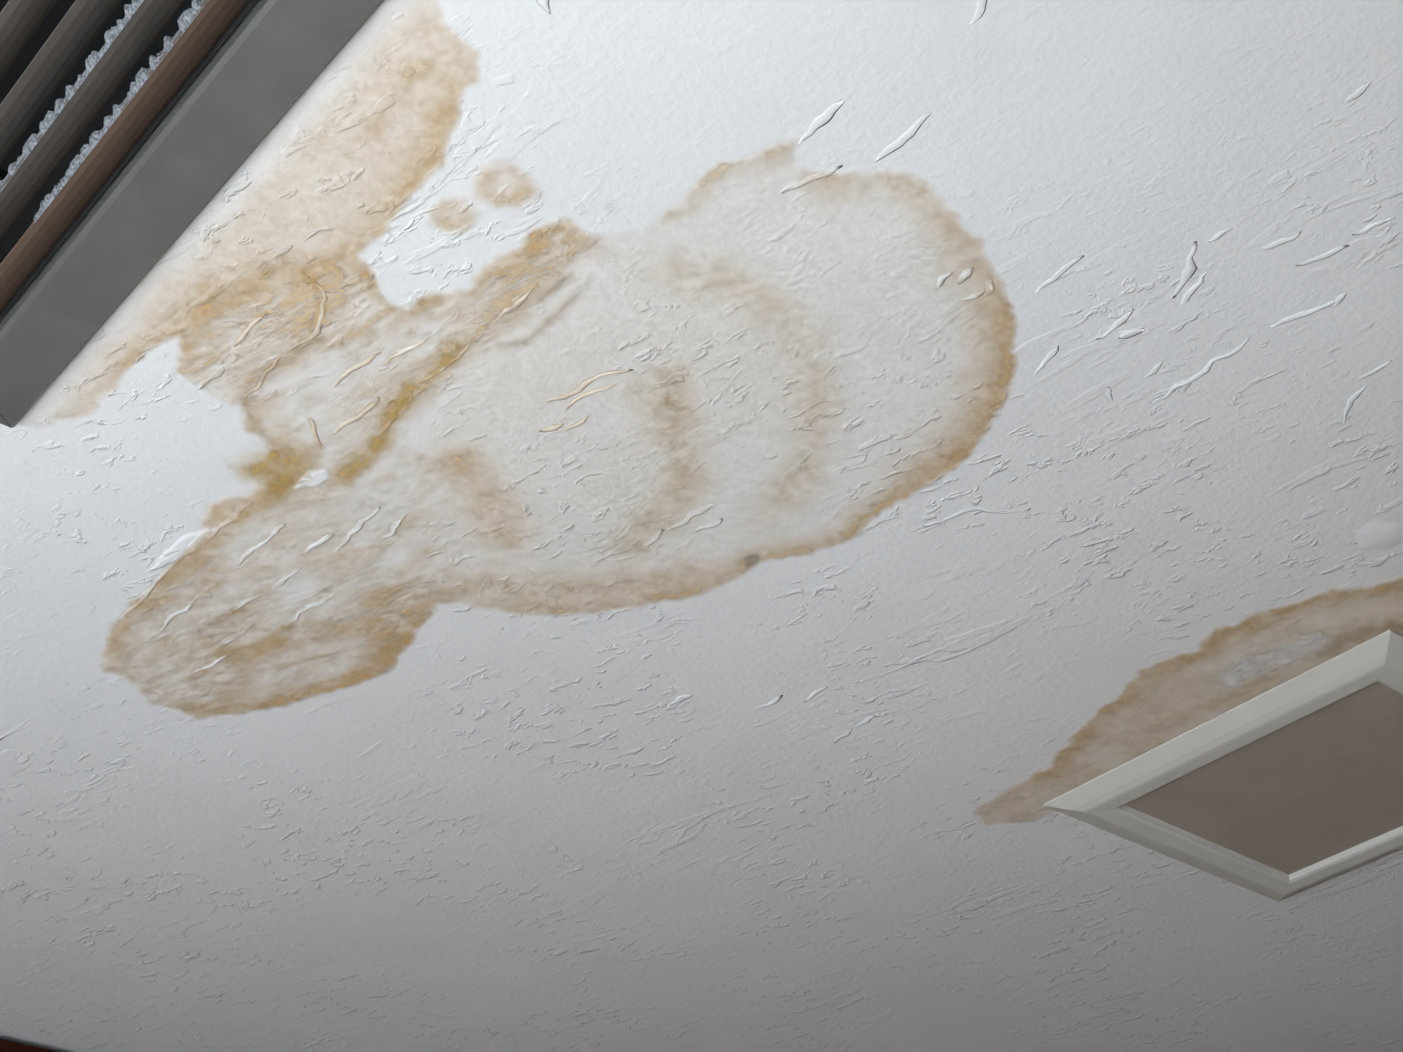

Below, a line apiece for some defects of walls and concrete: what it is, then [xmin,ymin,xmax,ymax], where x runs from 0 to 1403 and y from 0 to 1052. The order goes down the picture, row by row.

damp [384,385,417,421]